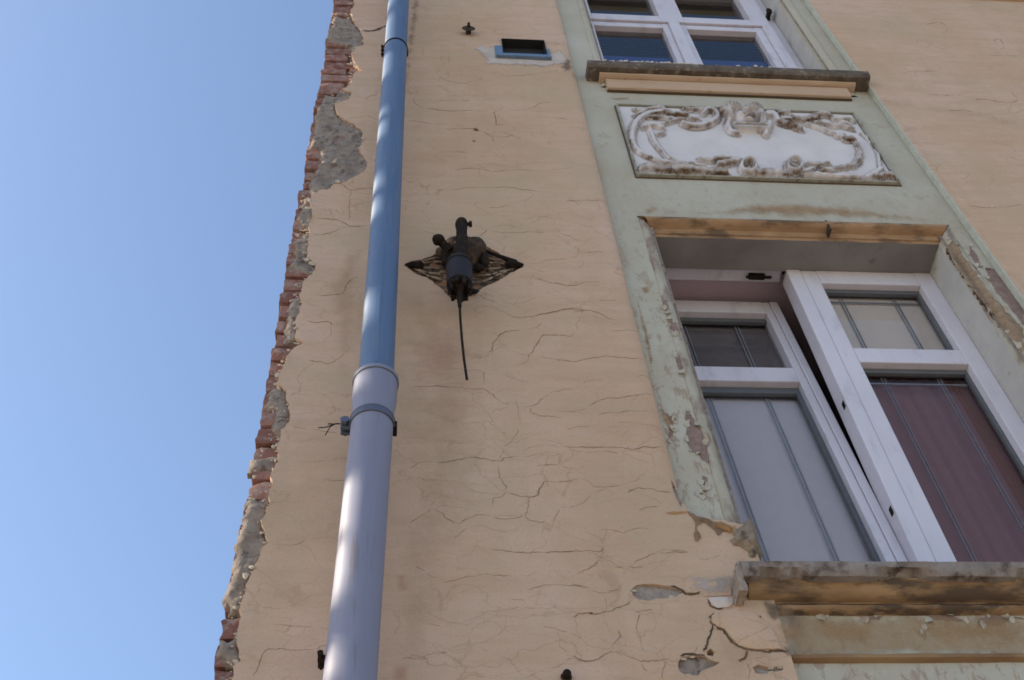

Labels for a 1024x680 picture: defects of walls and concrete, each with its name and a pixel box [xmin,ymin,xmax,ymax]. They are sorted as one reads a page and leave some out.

flaking render [325,12,363,52]
flaking render [287,92,367,278]
crack [491,278,637,362]
peeling [946,239,1024,352]
flaking render [222,494,269,620]
flaking render [247,389,290,479]
crack [439,456,574,523]
peeling [663,408,711,491]
flaking render [672,483,762,561]
flaking render [216,632,240,672]
crack [574,602,651,662]
flaking render [678,653,718,676]